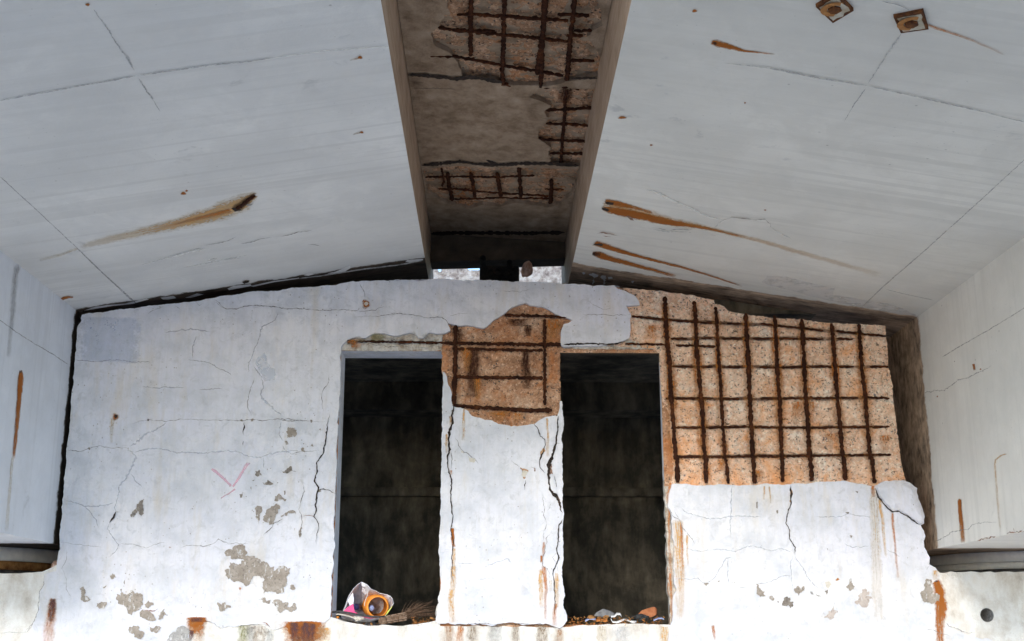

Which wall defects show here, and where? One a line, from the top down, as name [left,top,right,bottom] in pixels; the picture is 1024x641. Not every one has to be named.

spalling [430,0,595,163]
rust [136,194,257,234]
rust [592,241,736,285]
rust [602,200,755,241]
spalling [350,304,571,426]
crack [64,301,453,564]
spalling [608,281,906,623]
peeling [80,574,190,641]
peeling [224,544,297,613]
crack [442,406,563,629]
crack [670,487,810,588]
rust [933,570,947,641]